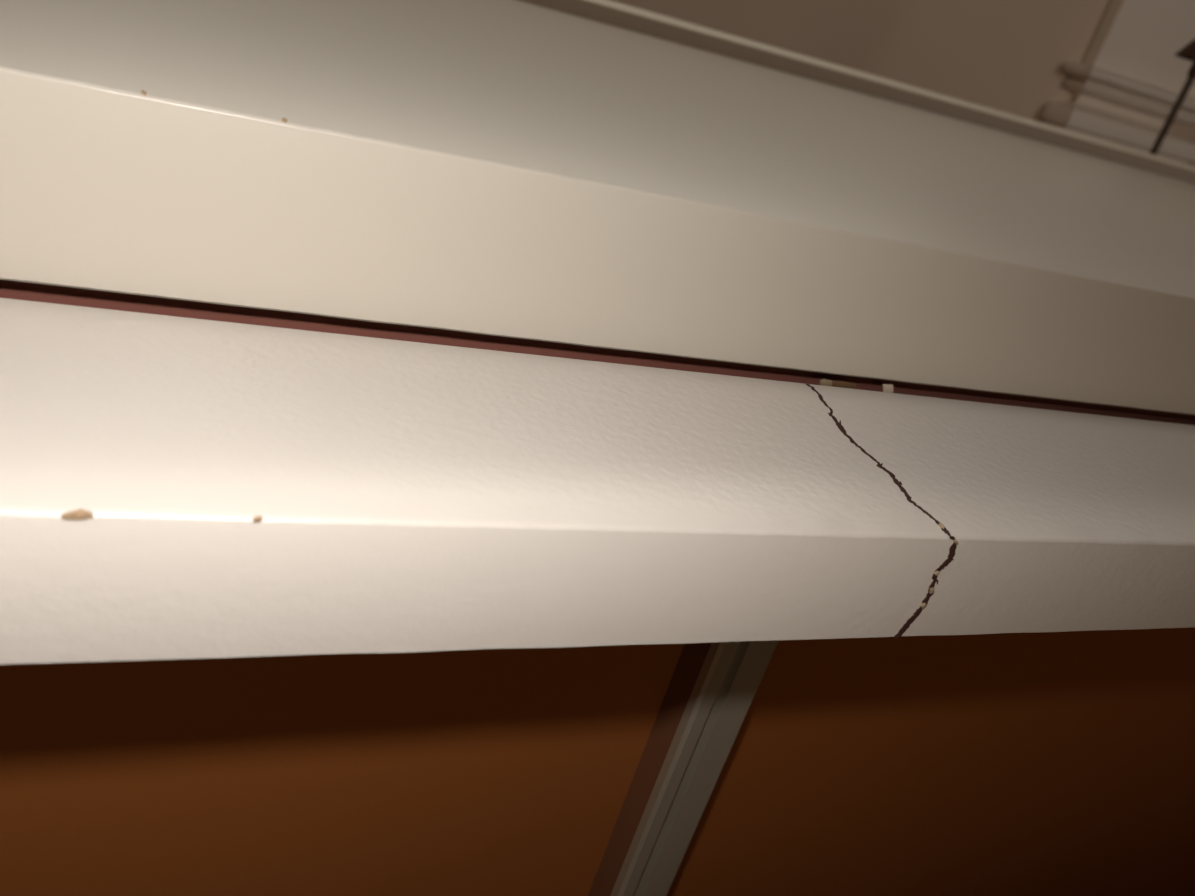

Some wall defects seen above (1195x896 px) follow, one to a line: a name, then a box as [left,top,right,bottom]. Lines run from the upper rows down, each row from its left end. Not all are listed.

crack [805,384,958,639]